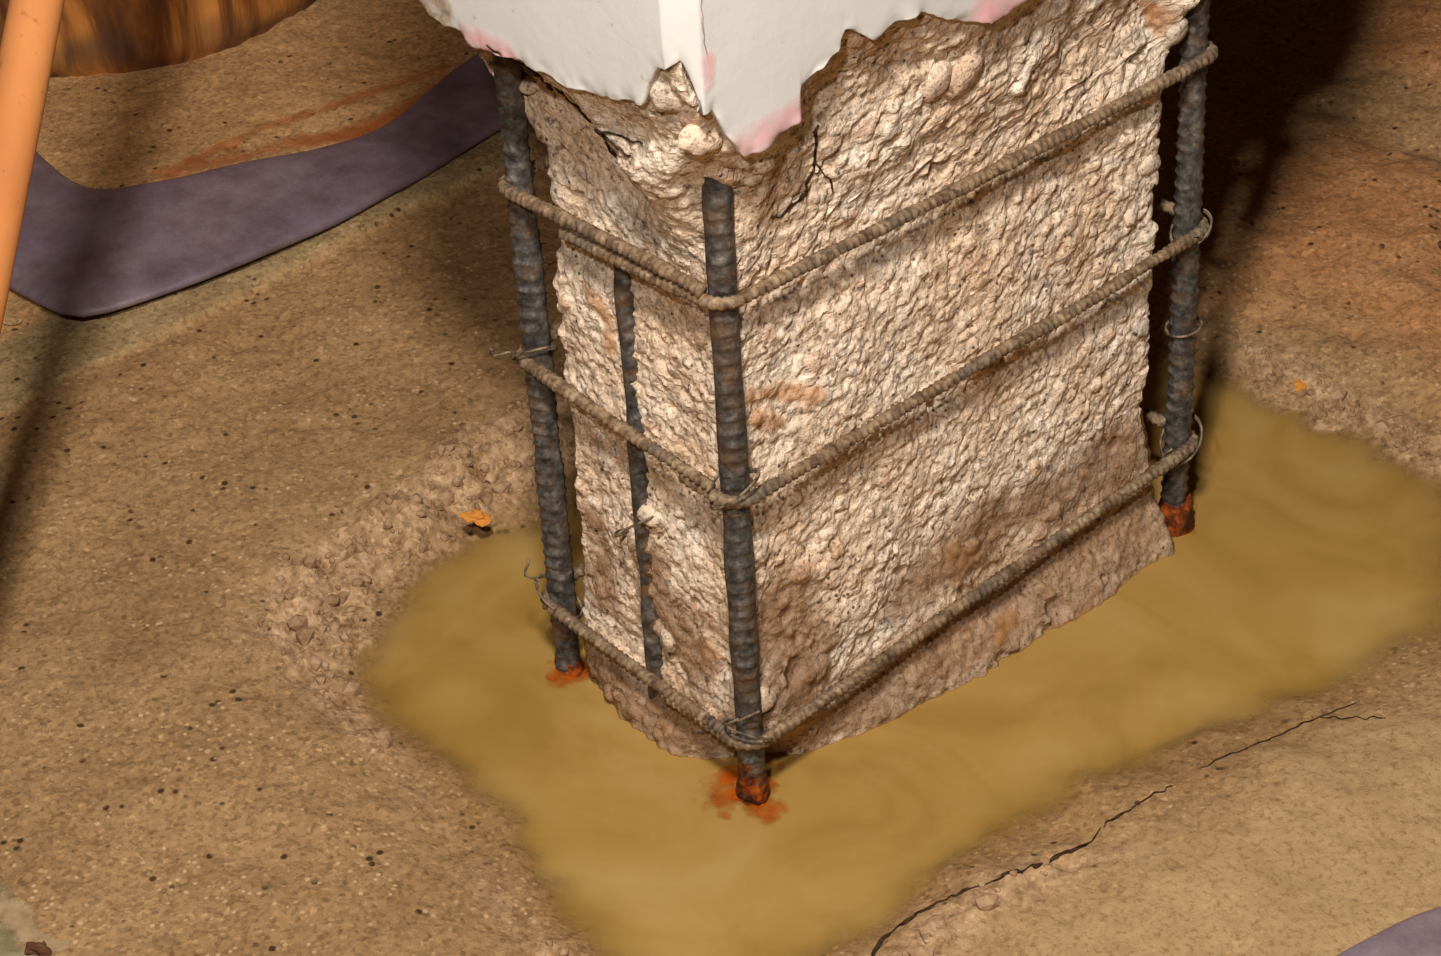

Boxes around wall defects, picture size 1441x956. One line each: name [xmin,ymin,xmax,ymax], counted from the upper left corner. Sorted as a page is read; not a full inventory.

spalling [479,48,494,76]
spalling [512,0,1200,759]
corrosion [1157,491,1195,537]
corrosion [547,656,590,685]
corrosion [716,759,782,821]
crack [871,702,1386,956]